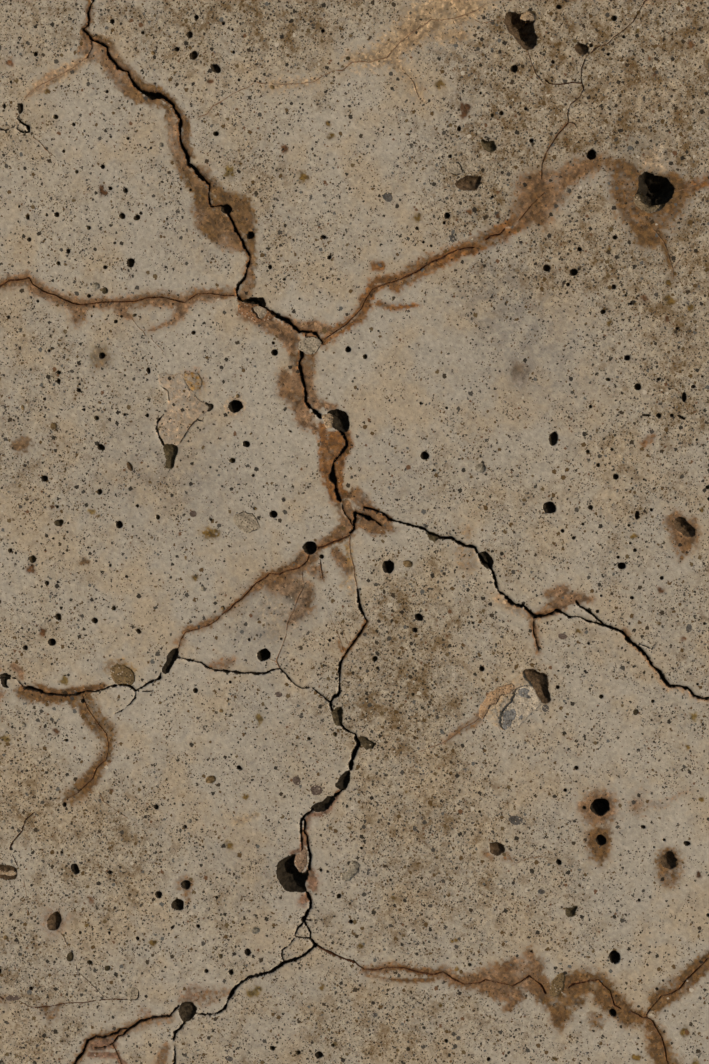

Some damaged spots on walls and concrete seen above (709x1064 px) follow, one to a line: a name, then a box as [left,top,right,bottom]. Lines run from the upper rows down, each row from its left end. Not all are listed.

crack [0,0,709,819]
spalling [479,668,551,731]
crack [0,808,709,1064]